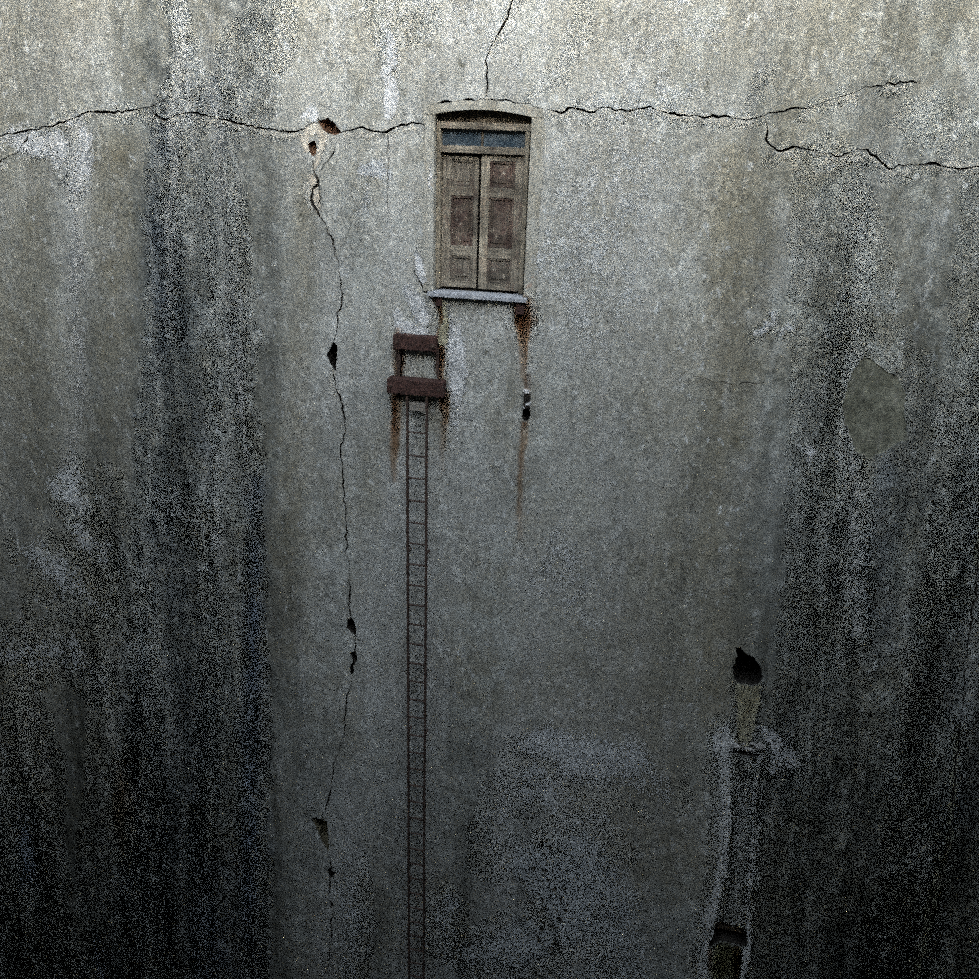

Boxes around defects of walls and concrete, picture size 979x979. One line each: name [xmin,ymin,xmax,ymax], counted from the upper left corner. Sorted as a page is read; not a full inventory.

crack [0,97,321,169]
spalling [300,106,342,208]
crack [439,0,979,175]
crack [303,121,425,341]
spalling [327,342,337,371]
corrosion [433,298,448,374]
leakage [17,540,100,610]
crack [322,368,357,815]
spalling [346,618,356,636]
spalling [733,646,763,685]
leakage [697,725,733,979]
leakage [734,829,758,979]